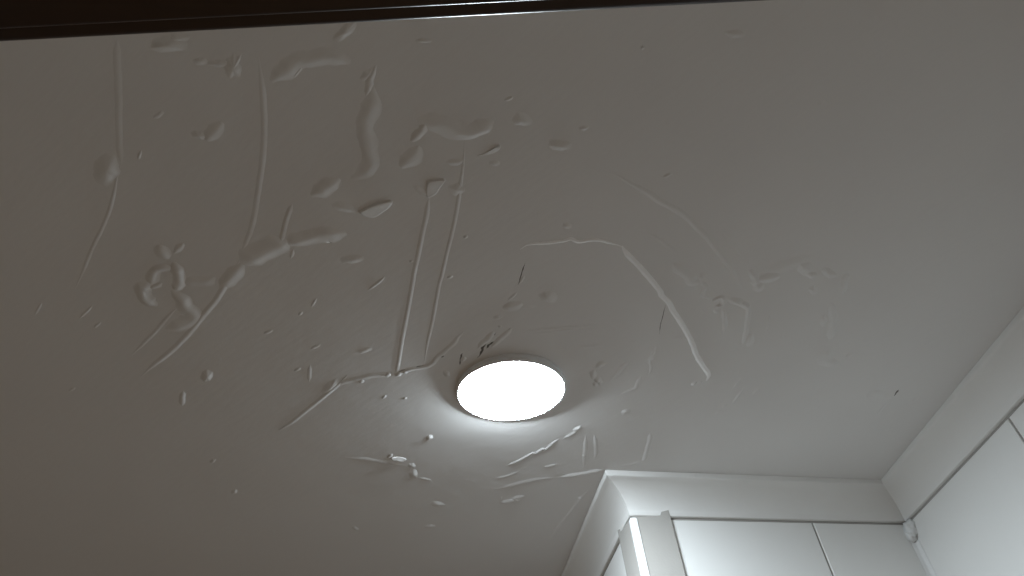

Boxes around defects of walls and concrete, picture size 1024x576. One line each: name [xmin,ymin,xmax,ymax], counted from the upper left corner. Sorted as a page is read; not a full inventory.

crack [279,325,512,430]